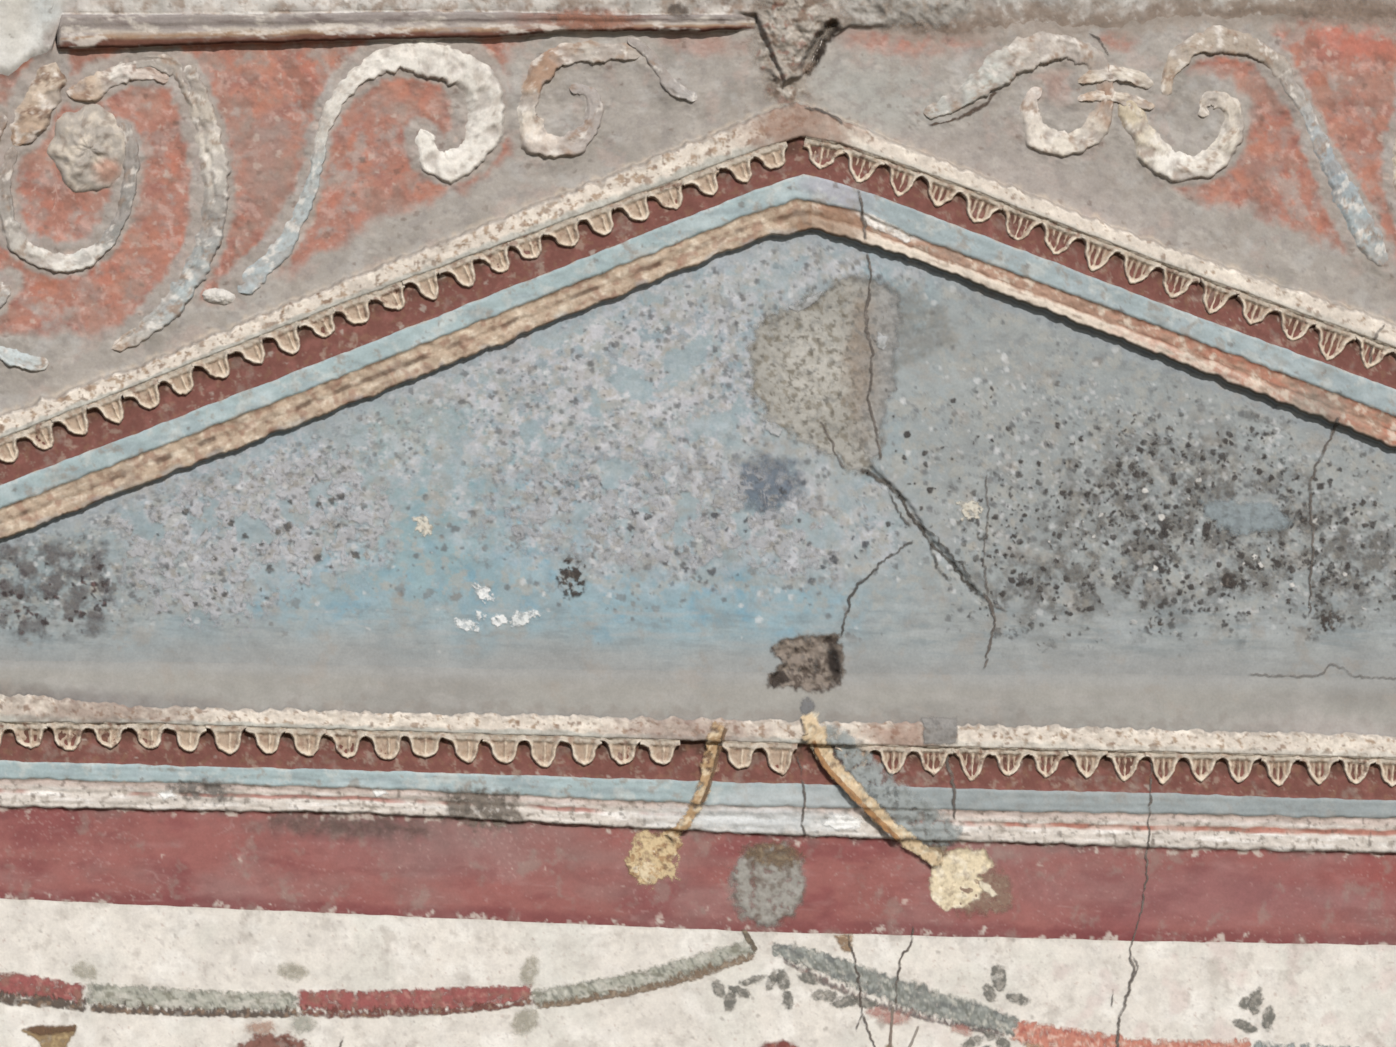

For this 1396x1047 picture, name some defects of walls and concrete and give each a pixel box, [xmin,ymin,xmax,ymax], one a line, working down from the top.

spalling [807,22,843,75]
leakage [0,544,109,633]
leakage [116,453,392,621]
spalling [768,633,845,715]
spalling [748,275,902,474]
crack [821,191,1004,667]
leakage [968,414,1396,632]
crack [1303,418,1340,612]
crack [1111,763,1153,1047]